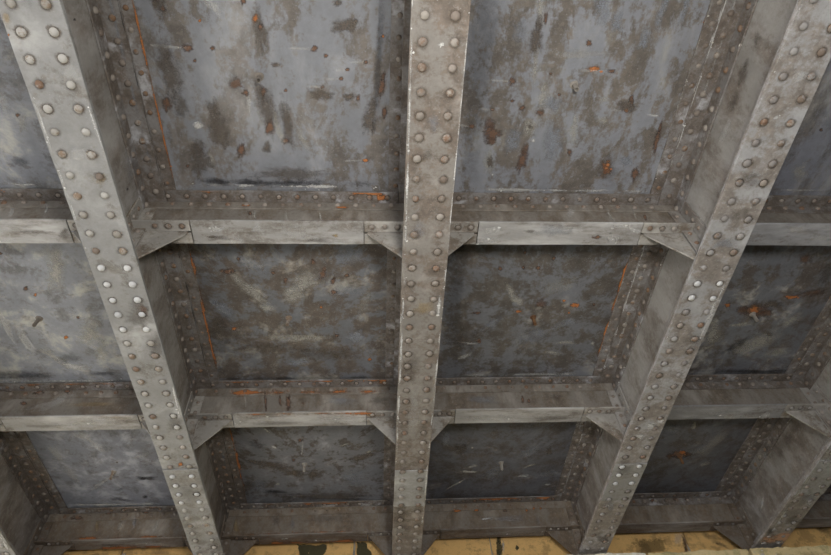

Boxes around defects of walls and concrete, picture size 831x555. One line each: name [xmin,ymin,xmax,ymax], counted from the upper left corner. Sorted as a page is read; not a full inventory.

rust [230,78,293,144]
rust [725,290,824,318]